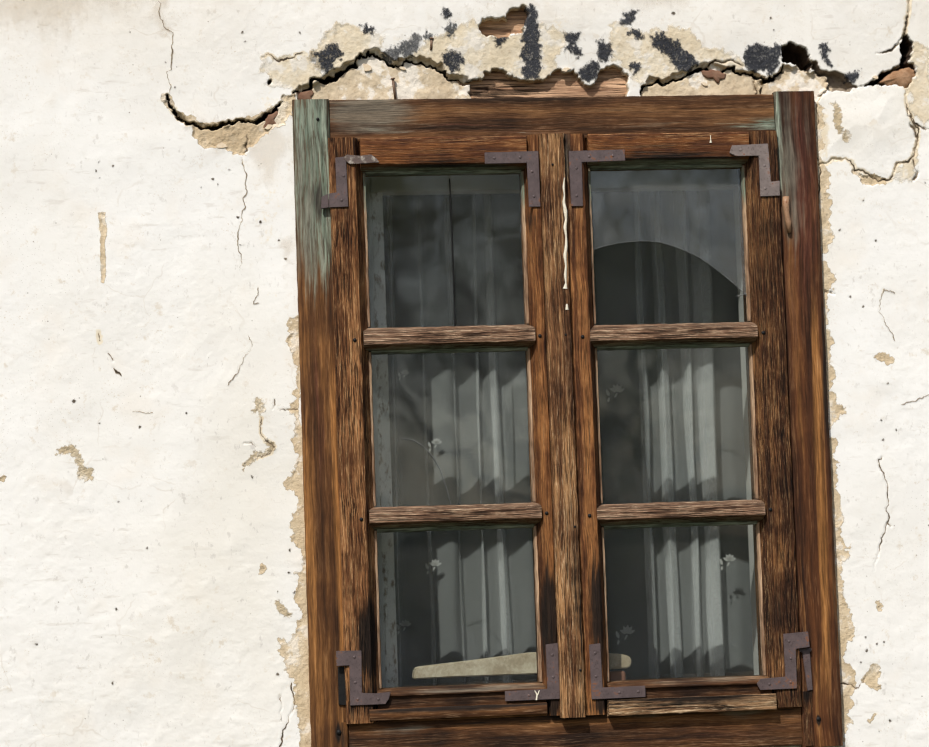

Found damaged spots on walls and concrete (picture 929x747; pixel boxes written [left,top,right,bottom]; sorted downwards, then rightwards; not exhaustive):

crack [880,0,909,53]
peeling [864,35,929,127]
crack [158,4,469,262]
crack [817,102,929,192]
peeling [851,150,918,186]
peeling [98,212,107,283]
flaking render [161,5,881,747]
peeling [874,352,895,365]
peeling [55,445,94,482]
crack [878,458,890,551]
crack [279,683,295,747]